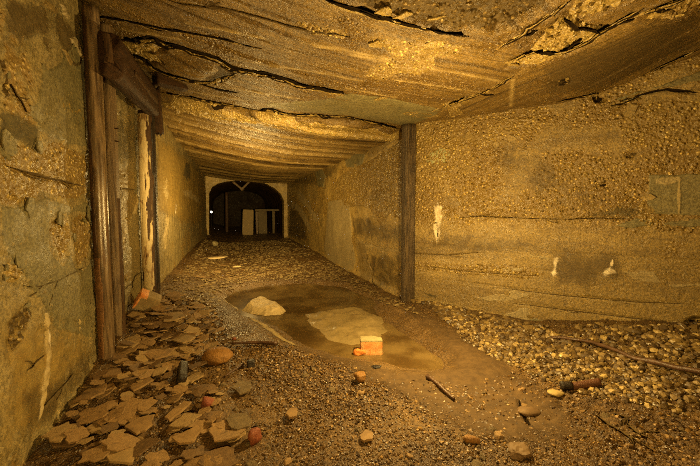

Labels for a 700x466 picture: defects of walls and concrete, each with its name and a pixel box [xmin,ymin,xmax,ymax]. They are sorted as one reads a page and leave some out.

crack [321,0,470,37]
crack [100,16,399,130]
crack [442,0,699,109]
leakage [433,205,442,242]
leakage [551,257,616,279]